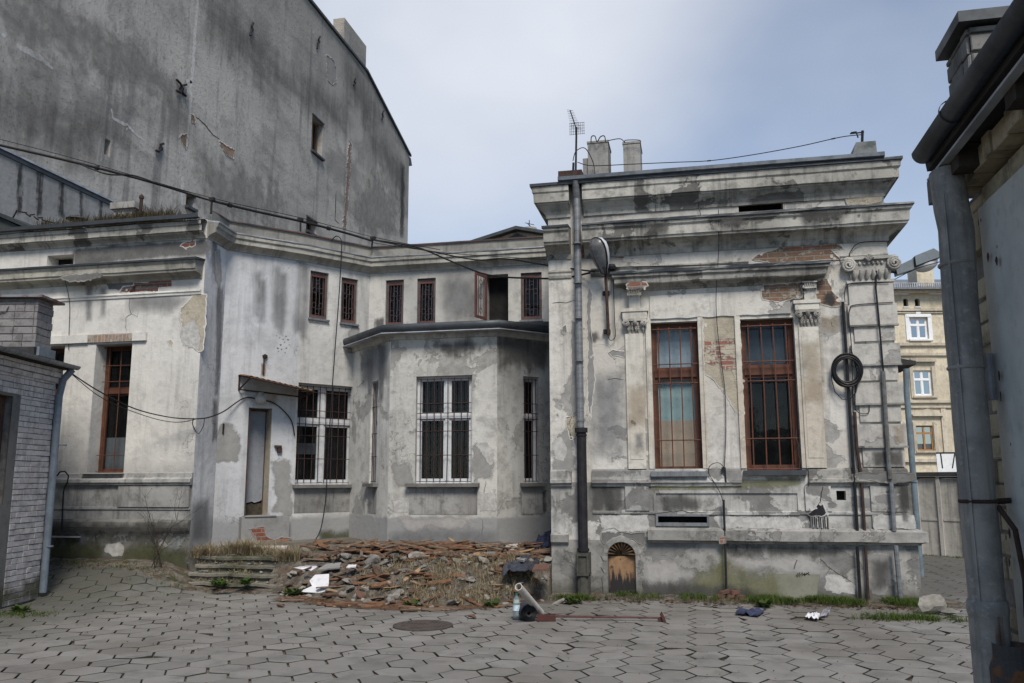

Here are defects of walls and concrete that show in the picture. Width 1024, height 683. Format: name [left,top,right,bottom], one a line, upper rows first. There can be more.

flaking render [219,140,235,160]
spalling [751,244,844,263]
spalling [760,278,842,308]
flaking render [167,293,207,353]
flaking render [702,316,745,415]
flaking render [249,526,293,542]
peeling [104,542,124,557]
flaking render [824,574,856,594]